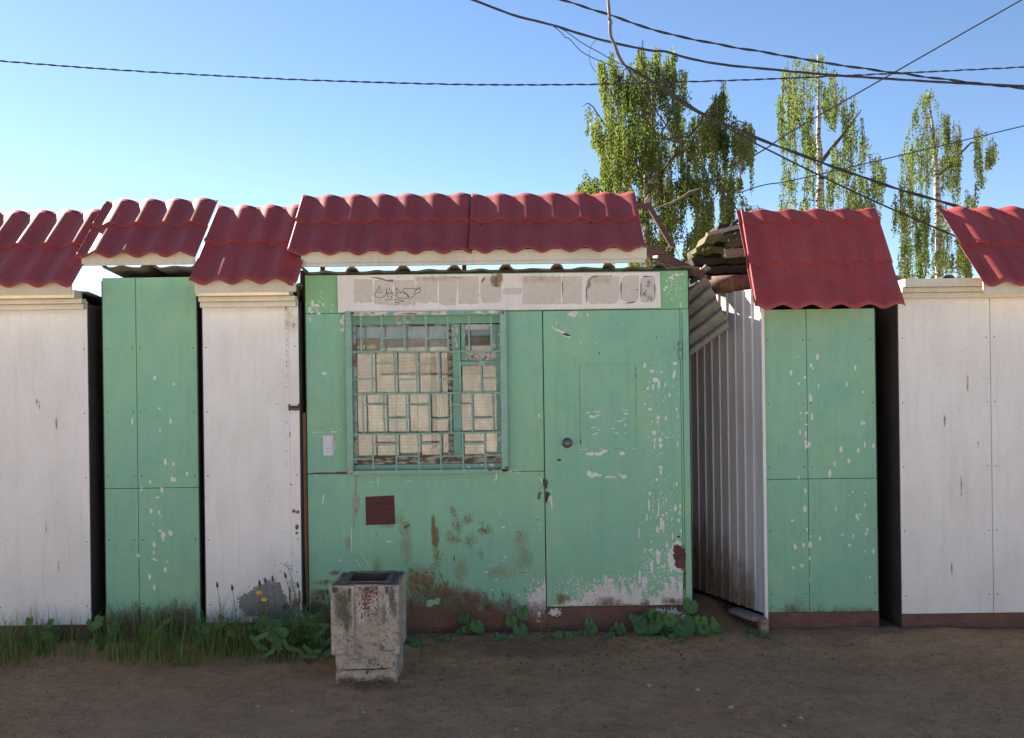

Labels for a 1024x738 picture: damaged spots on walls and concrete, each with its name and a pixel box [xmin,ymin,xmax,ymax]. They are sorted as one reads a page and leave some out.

peeling [789,353,819,449]
peeling [141,458,188,573]
rust [284,570,339,623]
rust [406,506,561,632]
peeling [518,362,687,622]
rust [673,536,686,590]